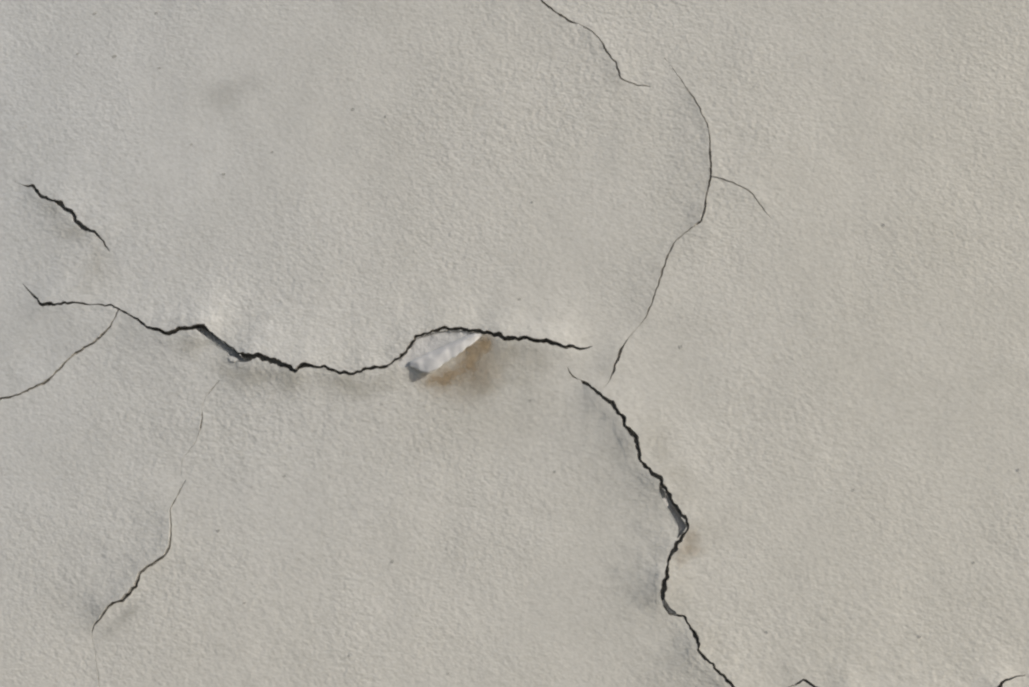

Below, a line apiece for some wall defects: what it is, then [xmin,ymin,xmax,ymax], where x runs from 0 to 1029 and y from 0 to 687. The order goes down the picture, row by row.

crack [541,0,650,87]
crack [0,59,770,687]
peeling [397,331,482,373]
crack [789,674,877,687]
crack [991,674,1025,687]